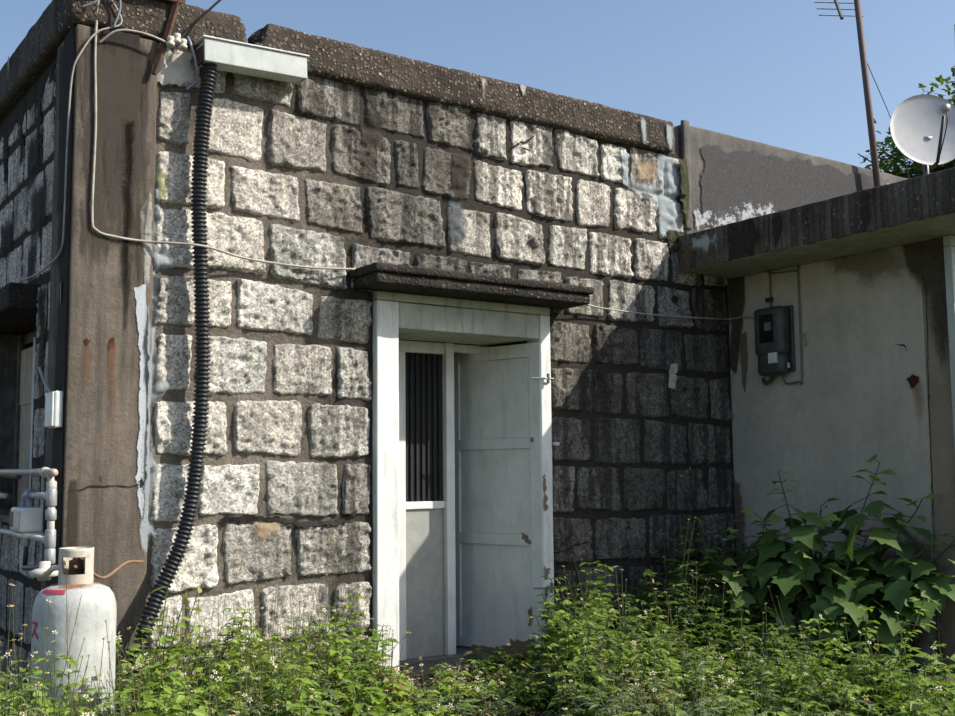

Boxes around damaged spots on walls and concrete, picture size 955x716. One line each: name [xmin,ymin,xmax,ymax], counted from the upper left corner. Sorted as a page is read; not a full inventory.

peeling [620,151,681,236]
peeling [692,202,775,251]
water stain [0,25,153,588]
rust [906,375,921,408]